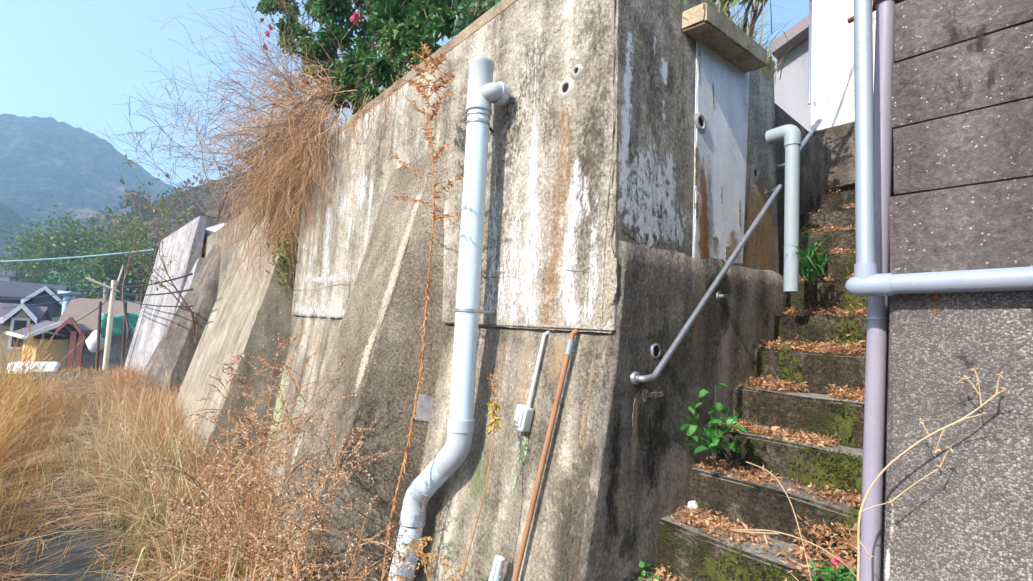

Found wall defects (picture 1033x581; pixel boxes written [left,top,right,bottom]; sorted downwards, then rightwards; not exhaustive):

leakage [947,10,985,51]
rust [540,110,572,322]
rust [699,157,709,260]
leakage [548,400,662,581]